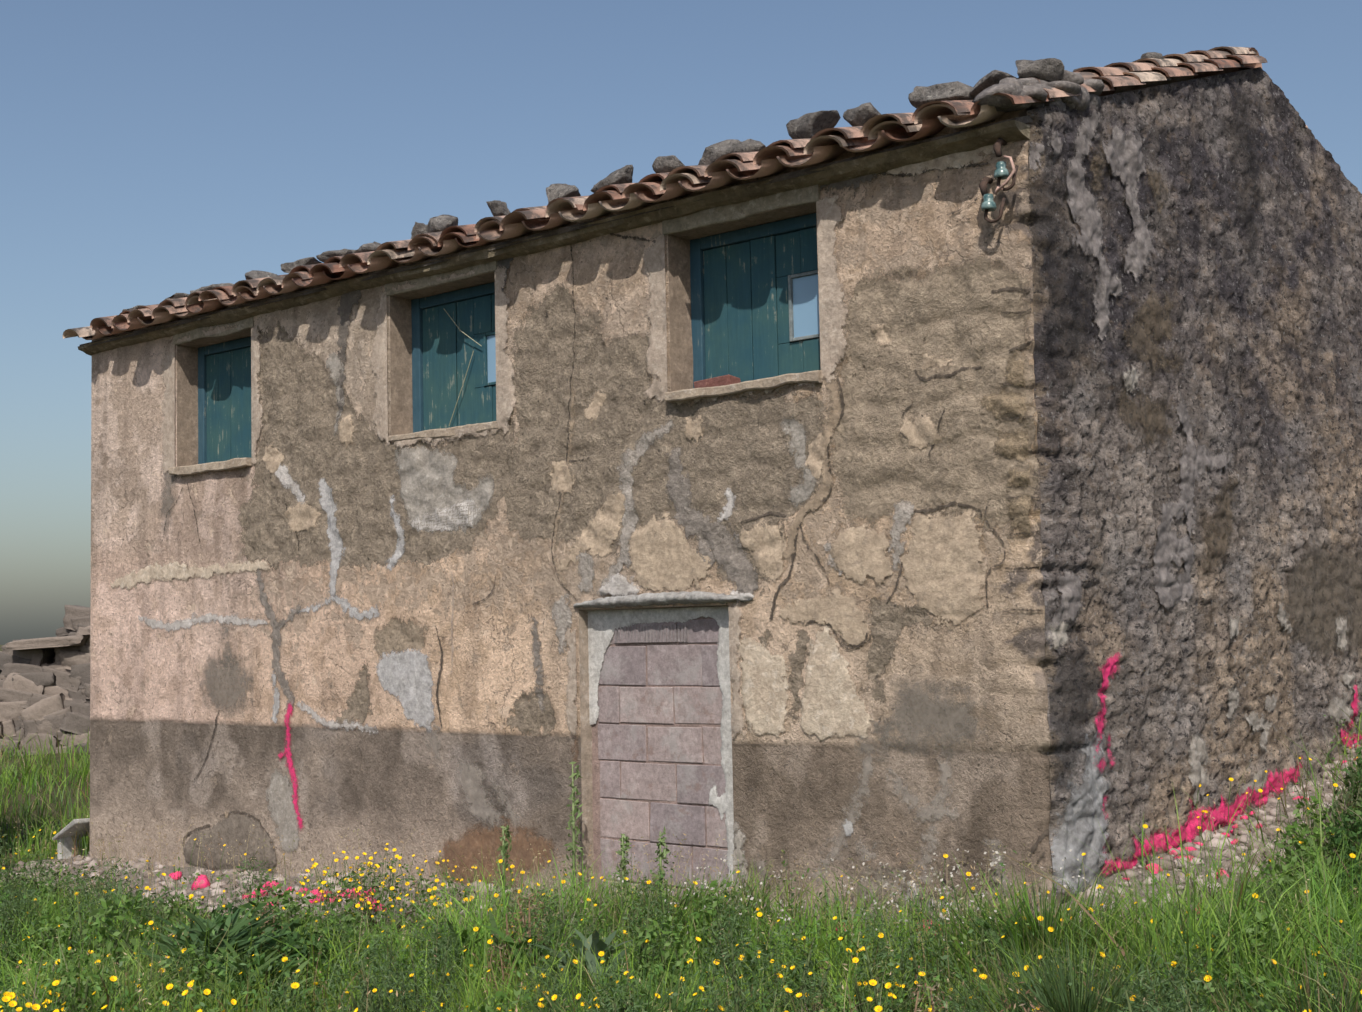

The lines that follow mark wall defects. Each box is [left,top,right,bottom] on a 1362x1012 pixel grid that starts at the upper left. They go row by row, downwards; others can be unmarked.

crack [138,465,380,734]
crack [385,495,405,571]
spalling [110,254,1039,742]
crack [551,245,845,620]
damp [810,682,985,889]
crack [807,495,1041,650]
crack [901,286,1036,456]
damp [1047,621,1069,649]
damp [1188,733,1227,823]
damp [1226,686,1278,751]
damp [1334,617,1349,650]
damp [1327,673,1362,748]